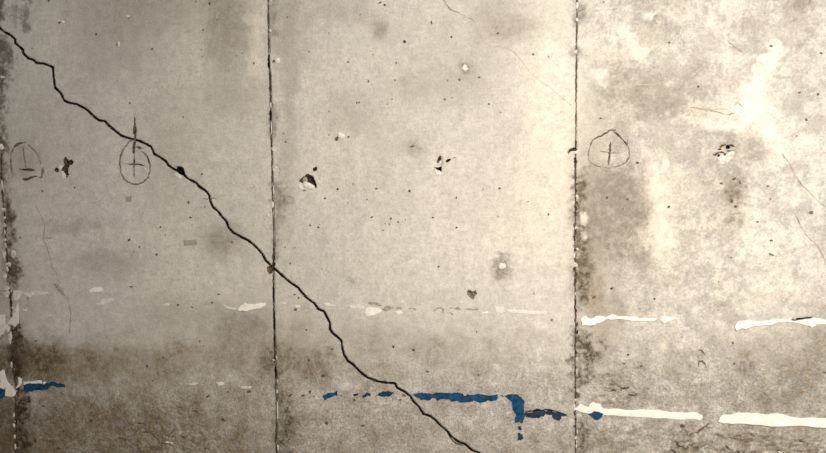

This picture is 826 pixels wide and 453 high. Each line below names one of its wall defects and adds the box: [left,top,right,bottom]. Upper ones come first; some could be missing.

crack [443,0,572,106]
hole [54,157,73,179]
hole [298,167,317,191]
spalling [713,144,753,229]
crack [0,27,480,453]
peeling [0,290,48,337]
damp [207,304,280,355]
damp [0,313,79,453]